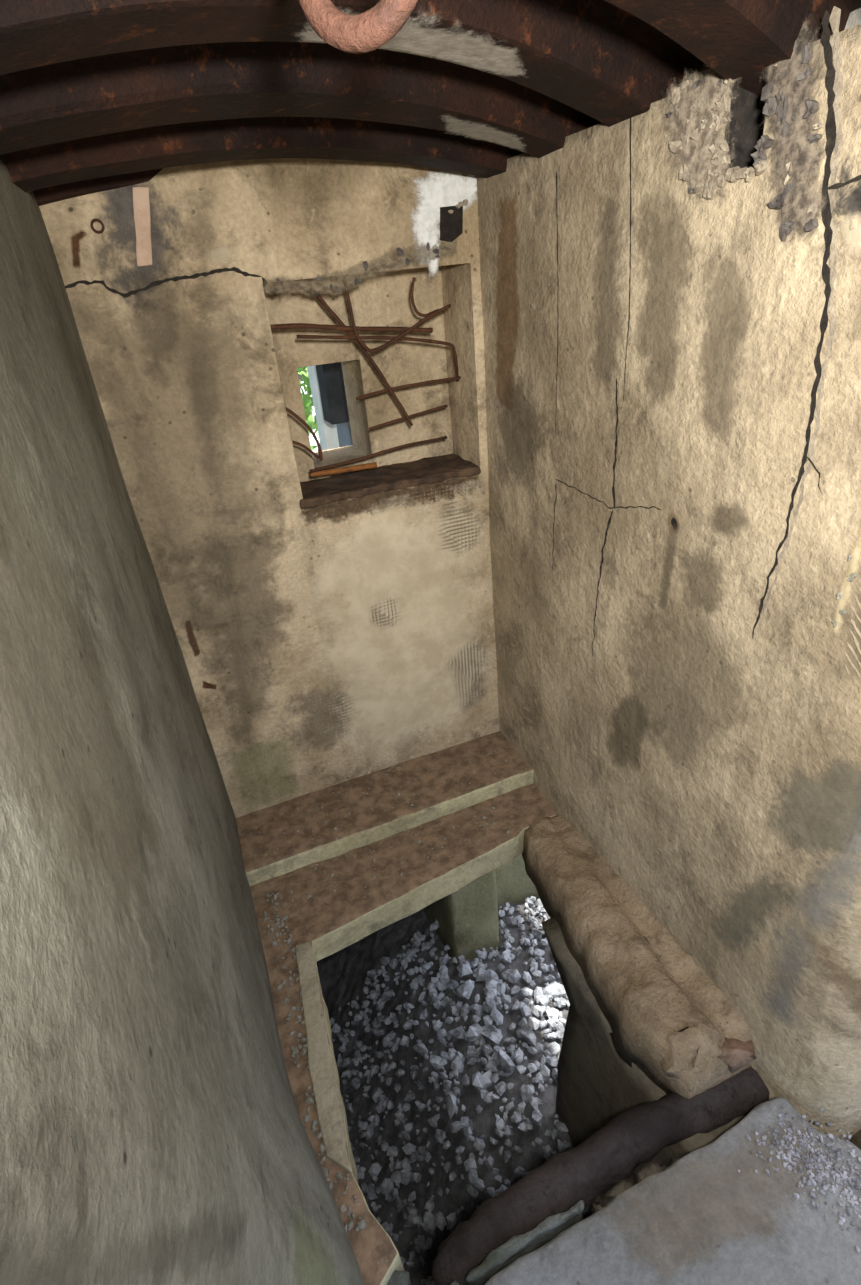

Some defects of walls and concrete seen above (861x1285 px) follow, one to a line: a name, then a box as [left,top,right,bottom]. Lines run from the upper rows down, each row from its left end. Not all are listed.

crack [65,267,366,298]
spalling [265,199,468,431]
spalling [664,23,825,241]
crack [752,6,861,640]
leakage [832,167,861,225]
spalling [286,407,447,478]